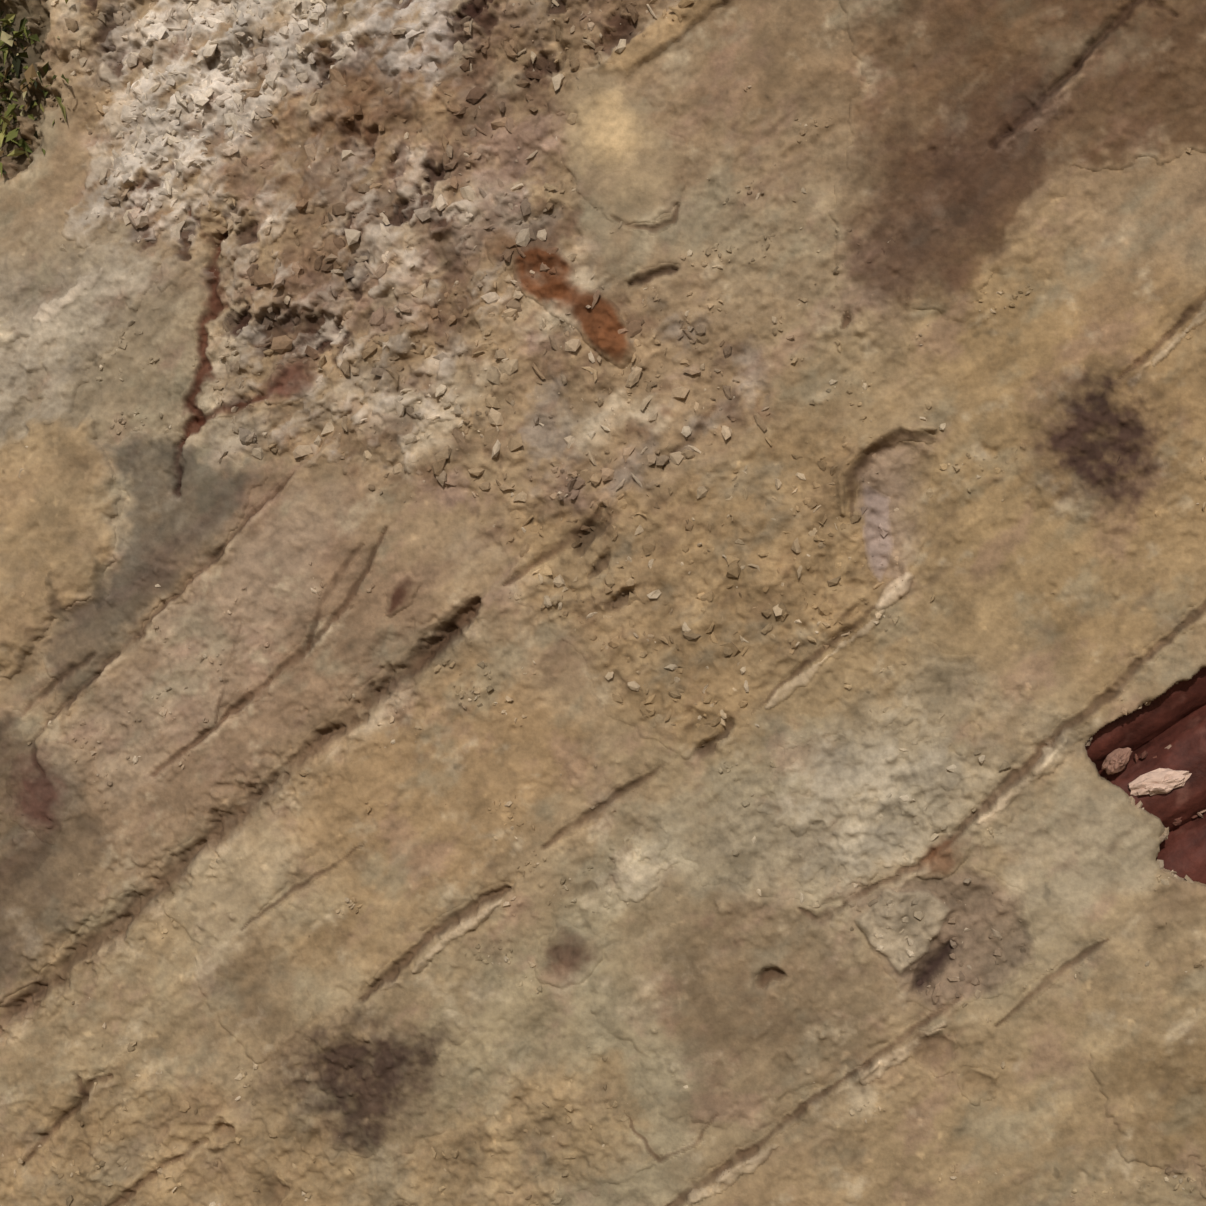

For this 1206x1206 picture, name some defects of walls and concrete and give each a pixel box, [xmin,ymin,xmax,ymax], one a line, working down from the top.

crack [176,209,264,444]
corrosion [484,232,636,369]
leakage [0,0,533,1004]
crack [660,407,716,472]
crack [751,586,896,715]
crack [0,469,606,1040]
crack [540,761,668,851]
spalling [1083,735,1204,884]